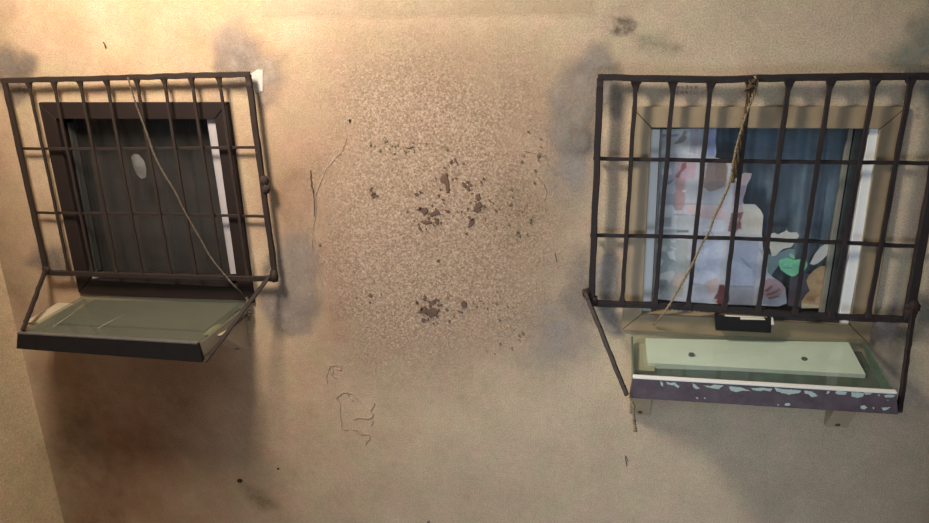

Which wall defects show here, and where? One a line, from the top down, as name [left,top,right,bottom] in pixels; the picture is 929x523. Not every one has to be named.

peeling [311,61,551,360]